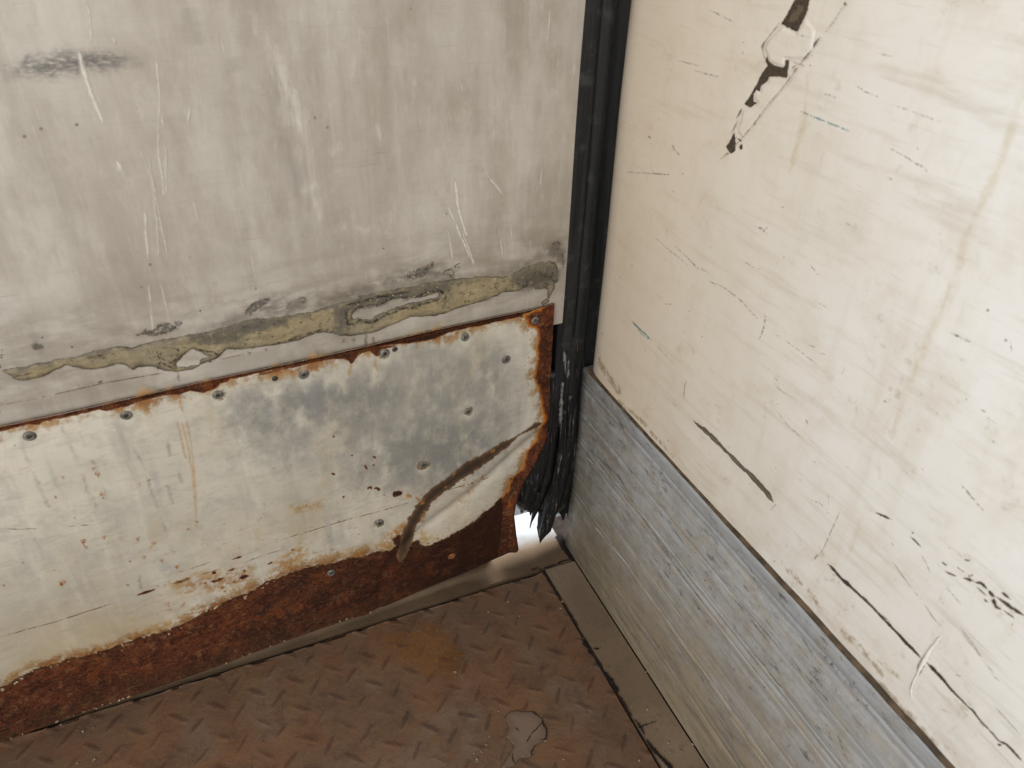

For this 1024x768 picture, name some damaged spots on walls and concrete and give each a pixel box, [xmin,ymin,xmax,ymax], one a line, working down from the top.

peeling [723,0,819,157]
corrosion [0,304,554,743]